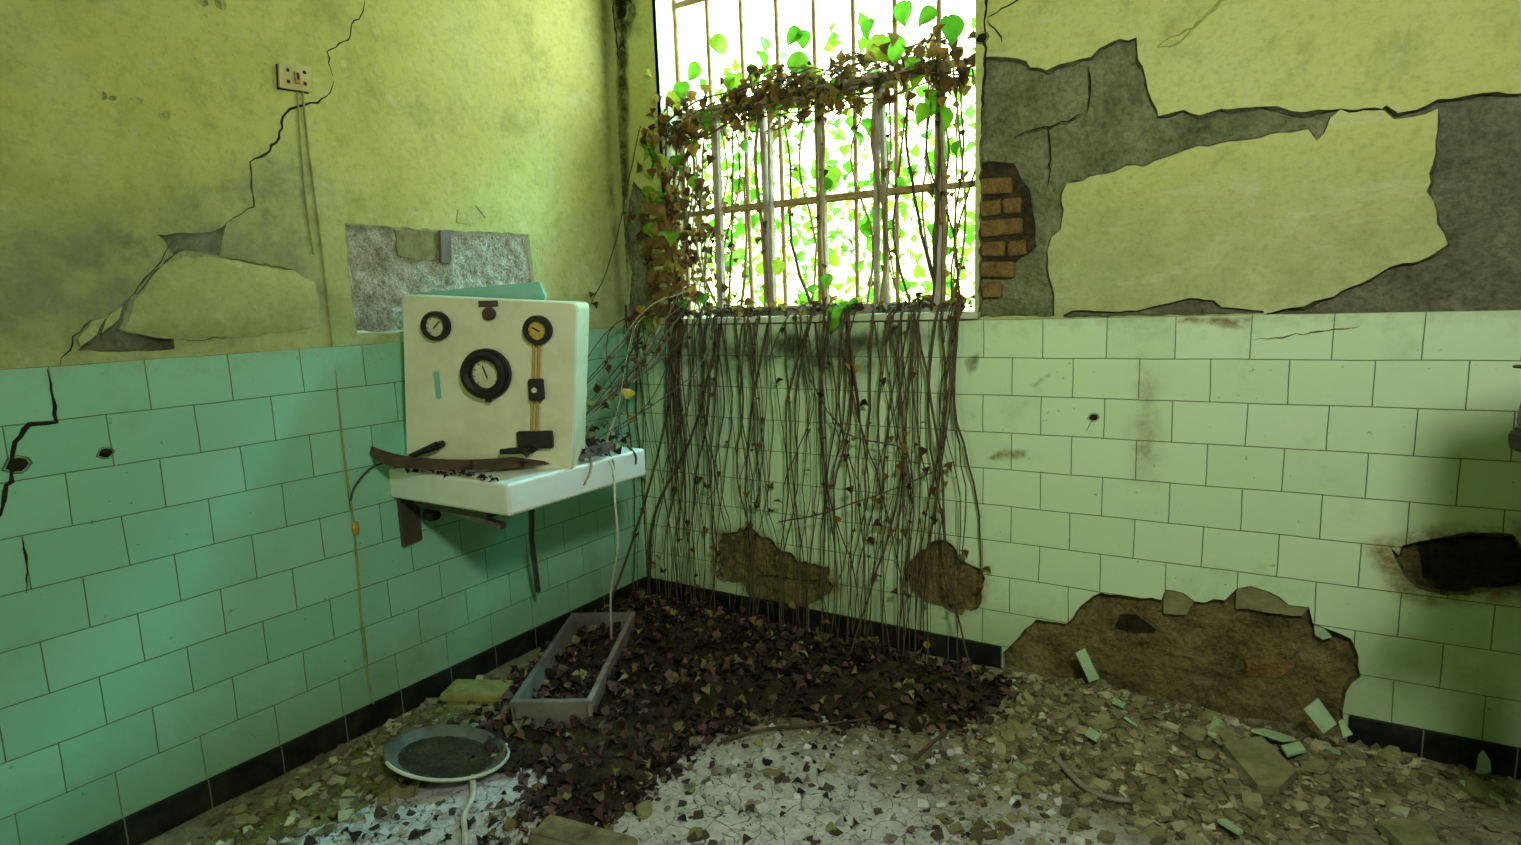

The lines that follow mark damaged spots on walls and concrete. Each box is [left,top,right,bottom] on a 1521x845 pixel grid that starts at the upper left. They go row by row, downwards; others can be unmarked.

crack [612,0,632,66]
crack [1157,0,1224,48]
crack [220,0,365,270]
water stain [615,0,635,268]
spalling [974,31,1521,318]
spalling [345,205,534,333]
crack [0,242,180,593]
peeling [712,526,840,607]
peeling [905,540,985,615]
peeling [1376,532,1521,600]
peeling [1003,586,1361,734]